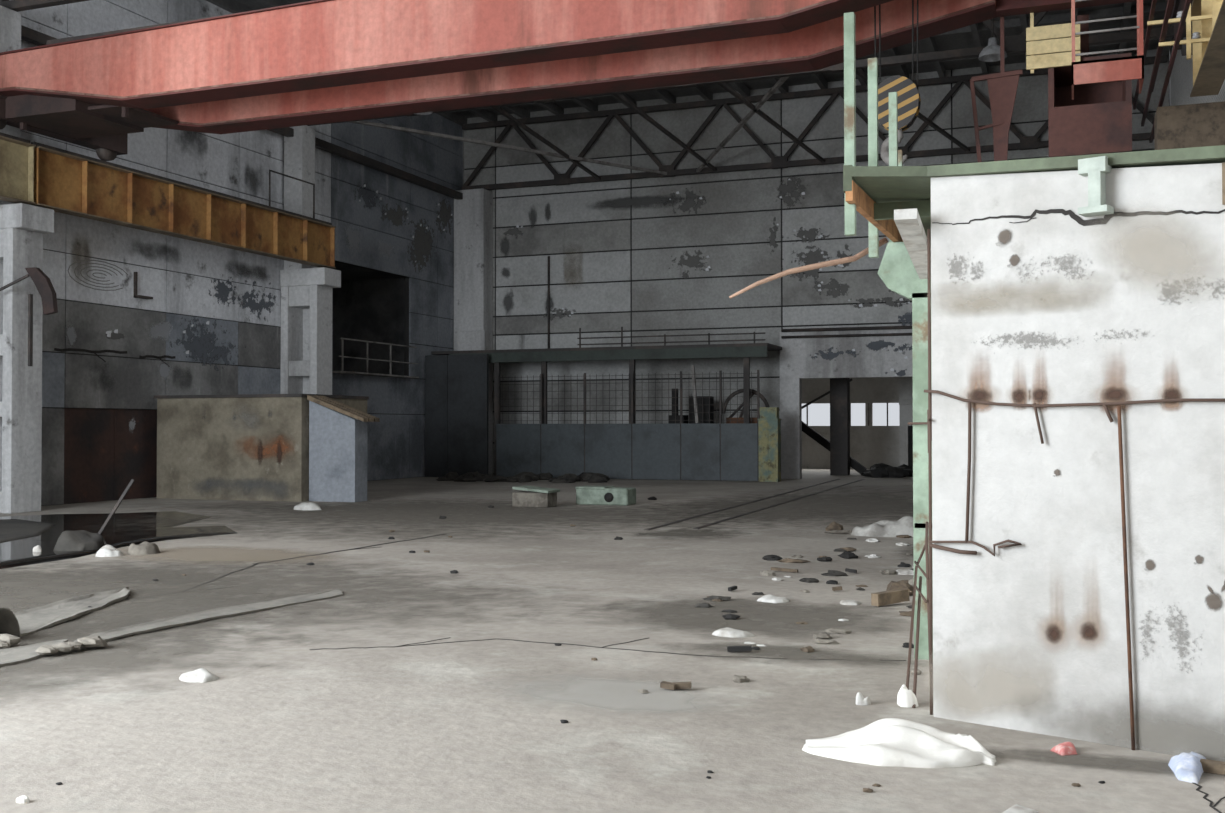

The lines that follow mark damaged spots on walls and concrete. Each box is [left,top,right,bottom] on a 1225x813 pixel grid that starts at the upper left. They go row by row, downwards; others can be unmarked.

crack [932,209,1225,226]
peeling [769,176,912,326]
peeling [810,340,912,376]
rust [970,375,990,410]
rust [1013,383,1045,408]
rust [1102,377,1127,412]
rust [1163,377,1179,409]
rust [244,438,290,464]
rust [1047,626,1060,641]
rust [1082,625,1096,639]